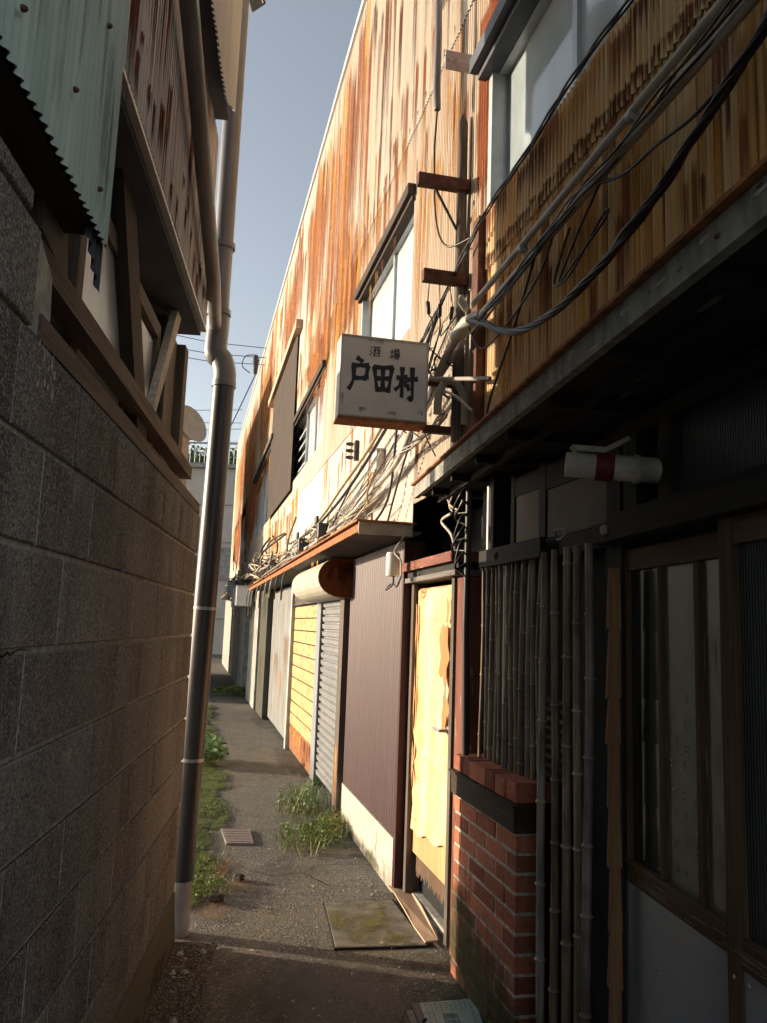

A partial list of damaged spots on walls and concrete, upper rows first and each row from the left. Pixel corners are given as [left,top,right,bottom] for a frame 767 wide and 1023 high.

corrosion [123,0,193,239]
corrosion [677,0,763,229]
corrosion [192,253,205,298]
corrosion [234,0,717,561]